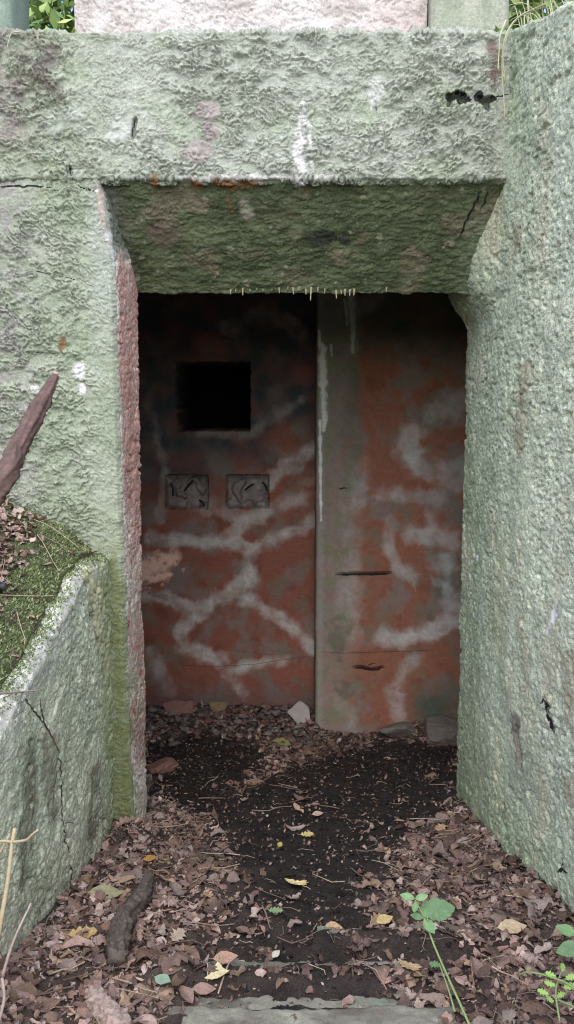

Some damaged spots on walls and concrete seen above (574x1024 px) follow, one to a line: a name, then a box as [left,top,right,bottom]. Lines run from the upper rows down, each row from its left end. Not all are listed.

spalling [445,90,509,109]
water stain [292,101,313,187]
corrosion [192,179,257,213]
crack [459,191,488,238]
peeling [115,256,185,603]
water stain [317,329,333,522]
crack [340,570,389,578]
crack [174,650,428,670]
crack [539,698,555,734]
crack [24,697,73,882]